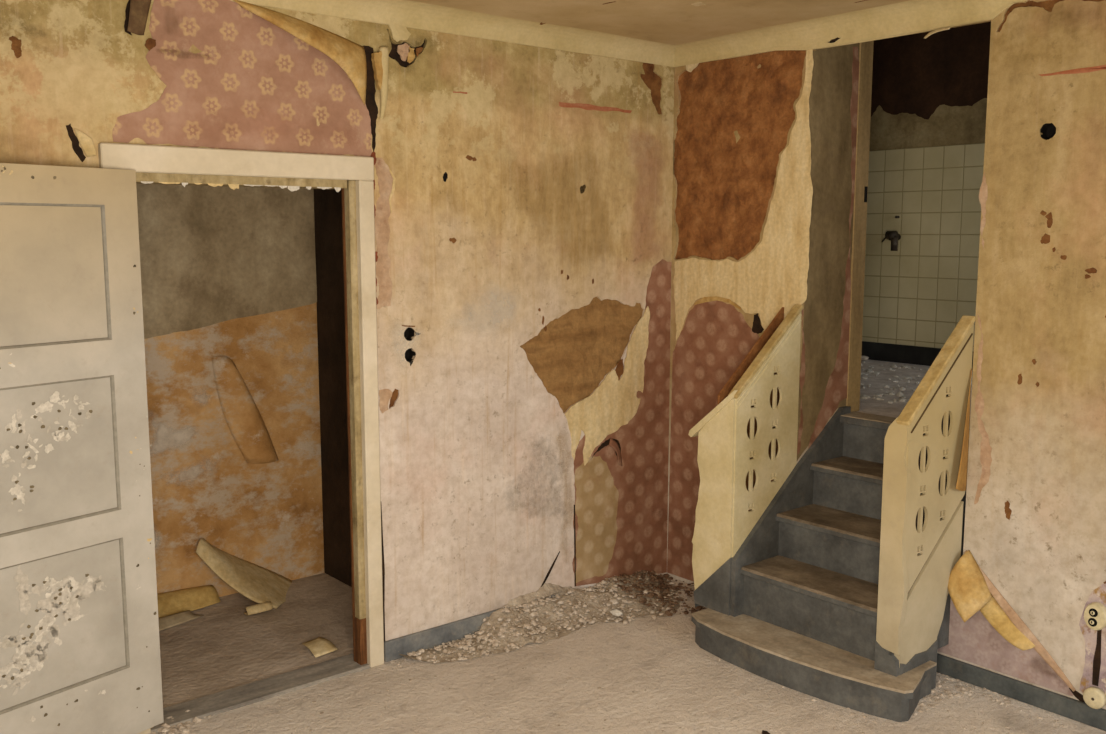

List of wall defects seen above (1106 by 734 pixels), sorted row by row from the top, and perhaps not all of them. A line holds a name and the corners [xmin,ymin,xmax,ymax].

flaking render [871,22,991,119]
flaking render [673,49,814,340]
flaking render [520,297,650,466]
peeling [0,391,93,512]
peeling [0,565,107,696]